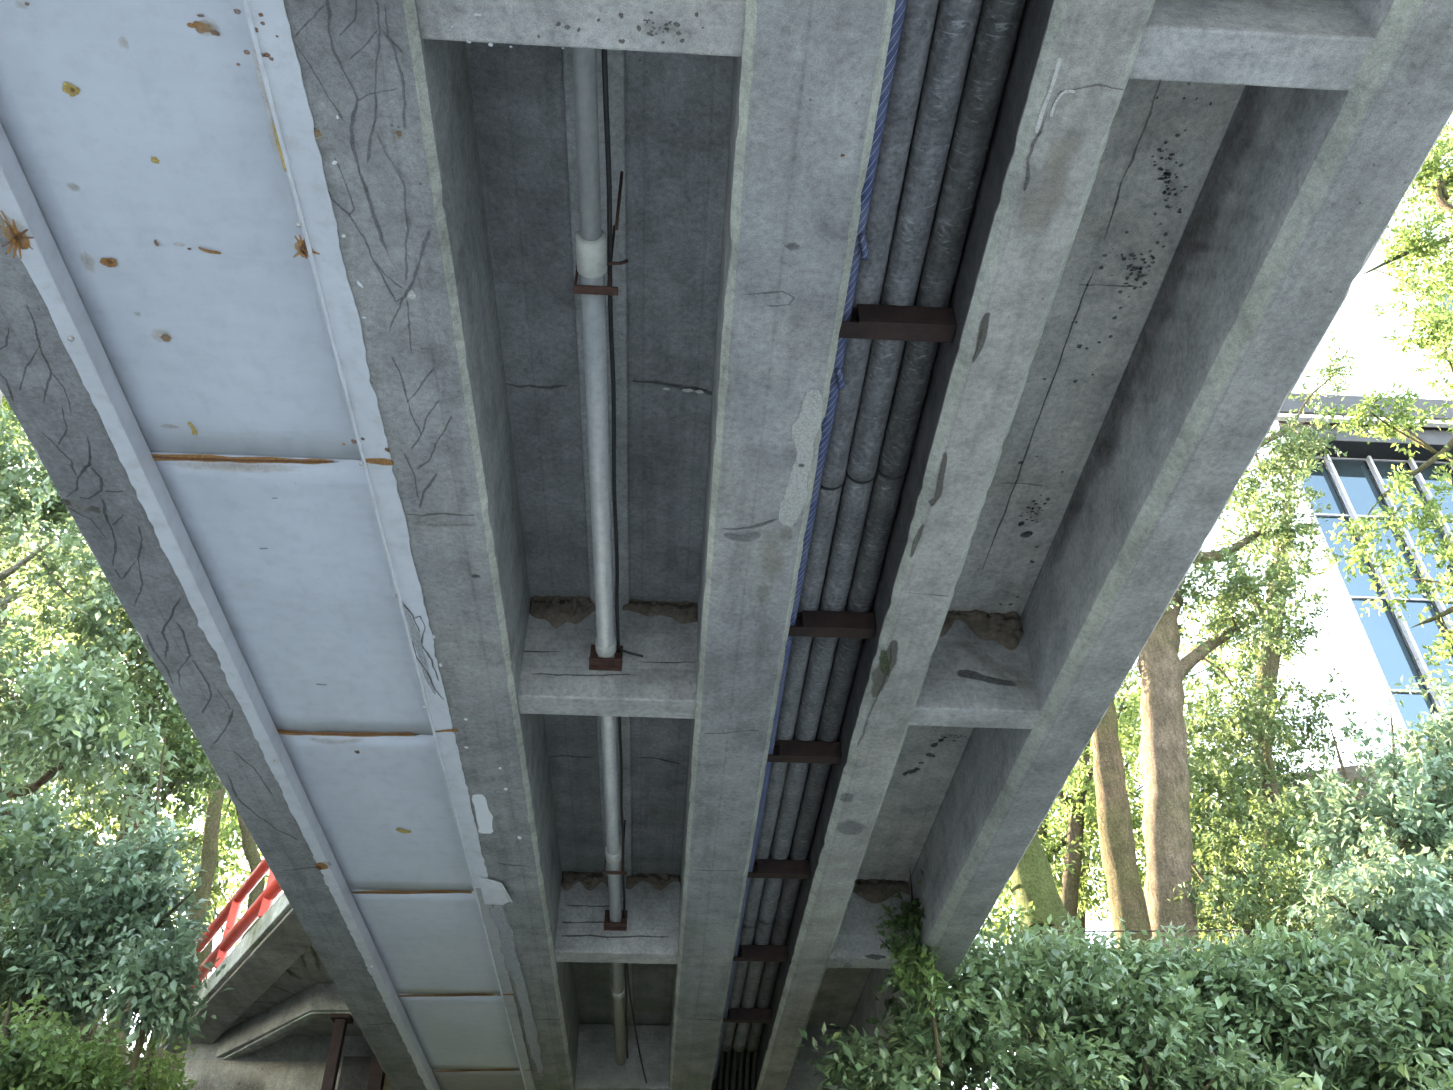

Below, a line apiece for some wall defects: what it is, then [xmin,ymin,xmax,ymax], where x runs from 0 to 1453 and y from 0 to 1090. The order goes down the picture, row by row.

corrosion [187,14,220,36]
corrosion [0,211,34,259]
corrosion [293,235,319,259]
crack [296,0,466,517]
leakage [1077,129,1204,350]
crack [0,304,144,603]
corrosion [151,454,334,464]
leakage [1018,495,1050,563]
spalling [529,595,596,628]
spalling [939,609,1024,650]
crack [149,603,316,871]
spalling [852,879,910,903]